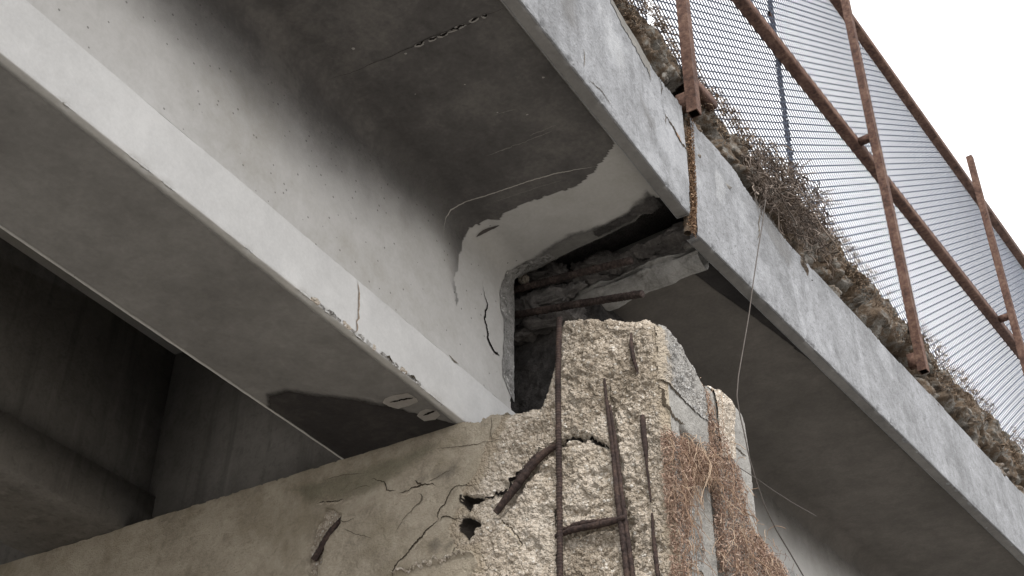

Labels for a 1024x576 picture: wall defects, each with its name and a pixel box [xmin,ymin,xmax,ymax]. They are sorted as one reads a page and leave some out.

leakage [175,0,687,277]
spalling [593,196,661,237]
peeling [310,297,440,421]
crack [483,290,499,355]
spalling [448,221,736,576]
crack [317,419,610,576]